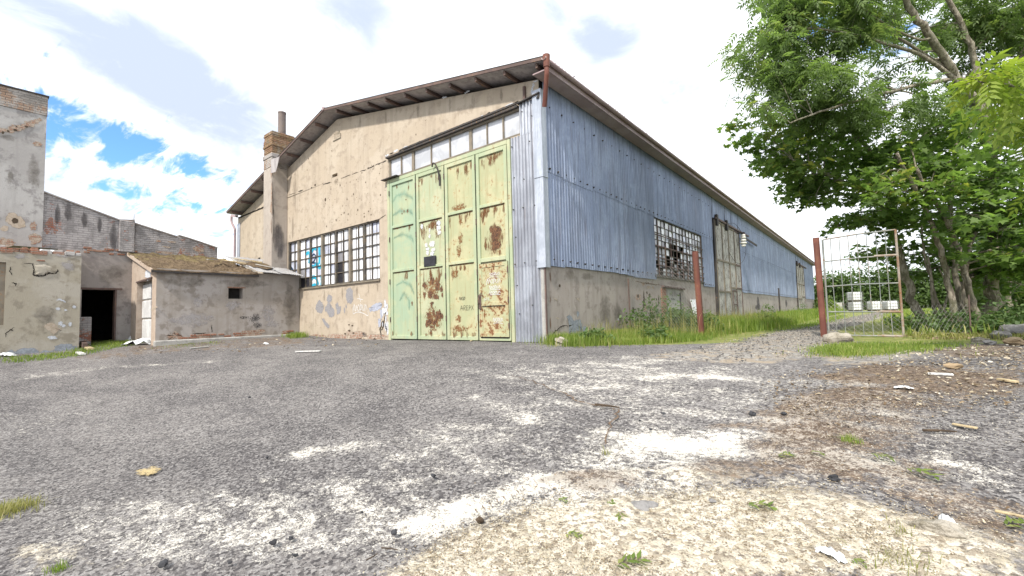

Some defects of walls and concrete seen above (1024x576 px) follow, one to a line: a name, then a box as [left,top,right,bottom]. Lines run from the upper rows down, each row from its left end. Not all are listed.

flaking render [0,213,42,259]
water stain [275,225,283,256]
rust [394,174,505,337]